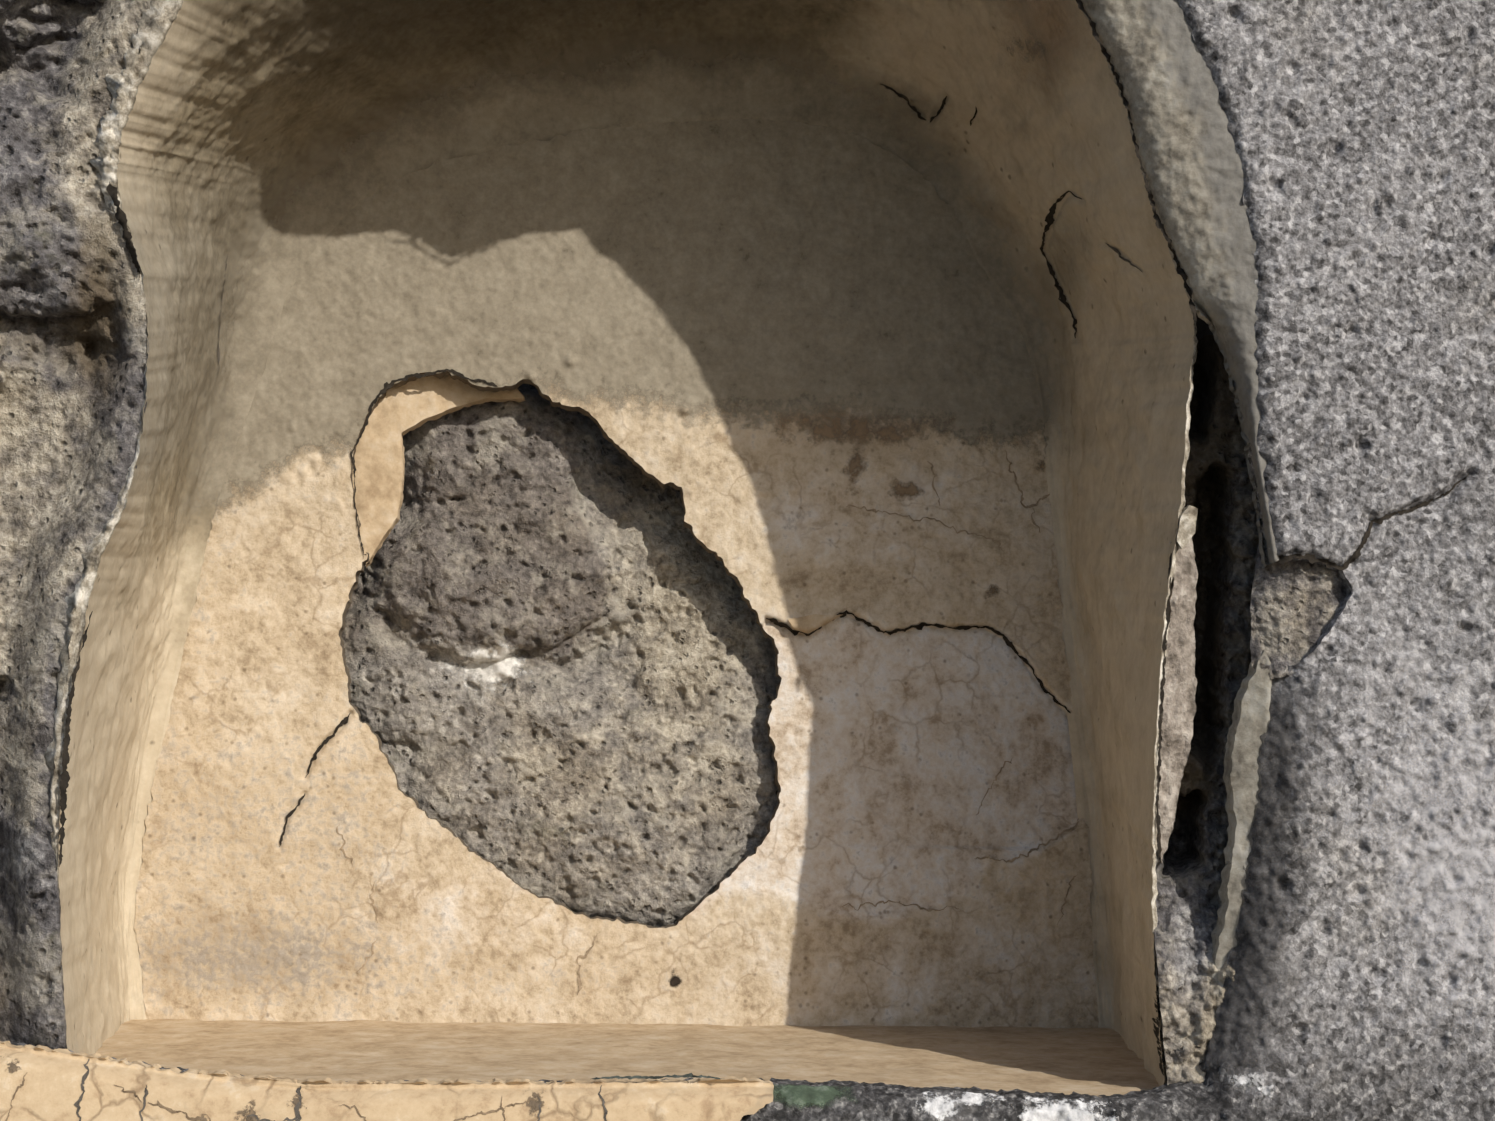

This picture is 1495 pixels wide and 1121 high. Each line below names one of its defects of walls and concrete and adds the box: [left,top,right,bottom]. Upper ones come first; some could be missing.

crack [880,84,977,126]
crack [1076,0,1197,322]
crack [1039,191,1082,338]
spalling [350,369,526,568]
crack [1278,472,1470,570]
spalling [44,315,148,896]
spalling [447,644,524,690]
crack [766,610,1070,713]
spalling [1151,315,1198,1084]
spalling [1250,545,1347,680]
crack [279,714,350,847]
flaking render [0,1041,774,1121]